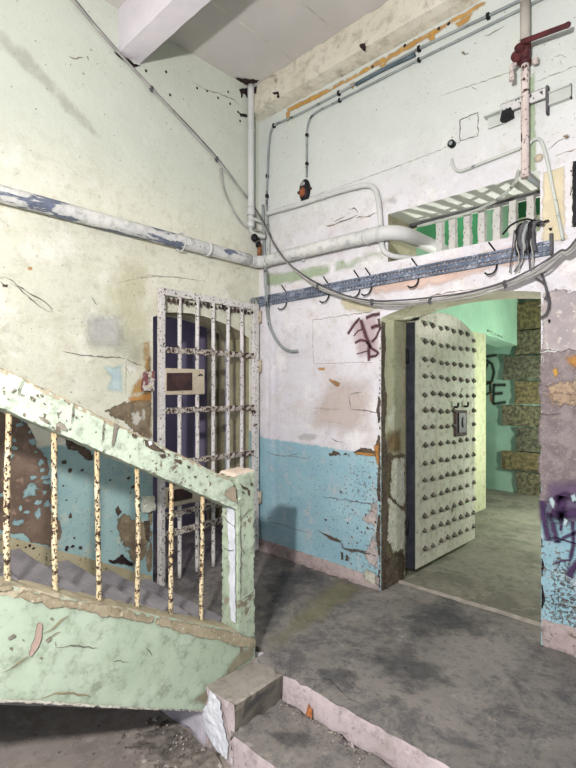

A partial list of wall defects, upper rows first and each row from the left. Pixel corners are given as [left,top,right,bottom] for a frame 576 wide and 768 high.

crack [196,84,241,122]
crack [64,351,143,394]
peeling [537,288,576,504]
peeling [0,411,82,551]
peeling [39,416,93,473]
flaking render [105,393,196,479]
peeling [328,318,406,591]
flaking render [109,506,153,572]
crack [268,517,375,561]
peeling [0,583,256,673]
peeling [0,690,233,764]